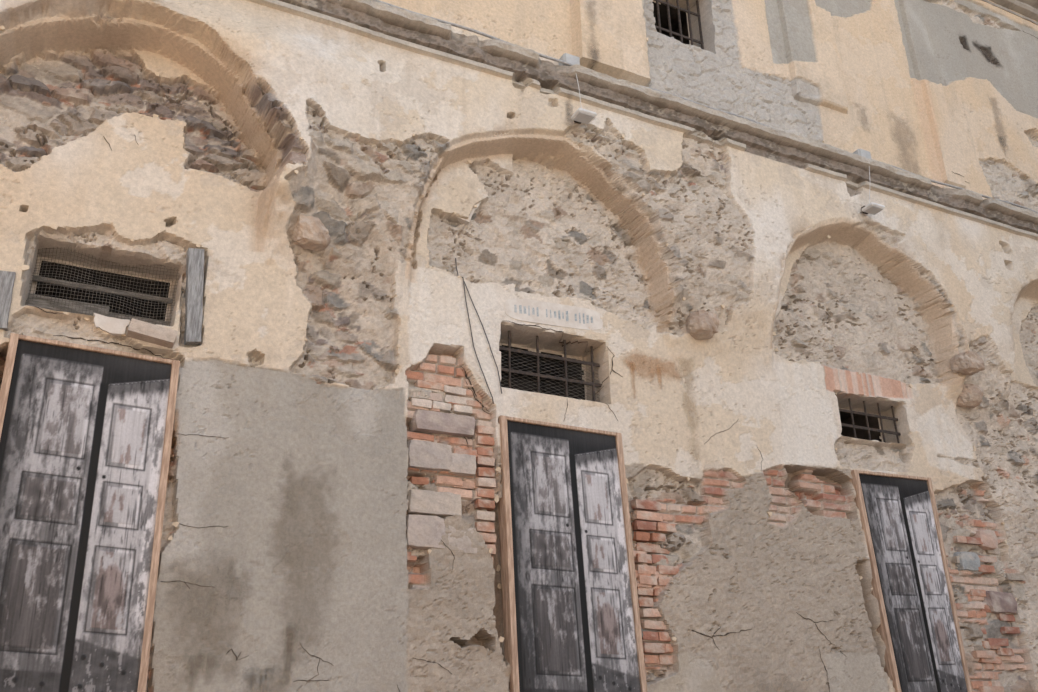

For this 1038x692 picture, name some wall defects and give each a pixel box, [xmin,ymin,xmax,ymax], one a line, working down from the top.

flaking render [0,9,757,589]
flaking render [846,183,864,197]
flaking render [978,157,1038,212]
flaking render [763,220,1038,692]
flaking render [626,464,747,683]